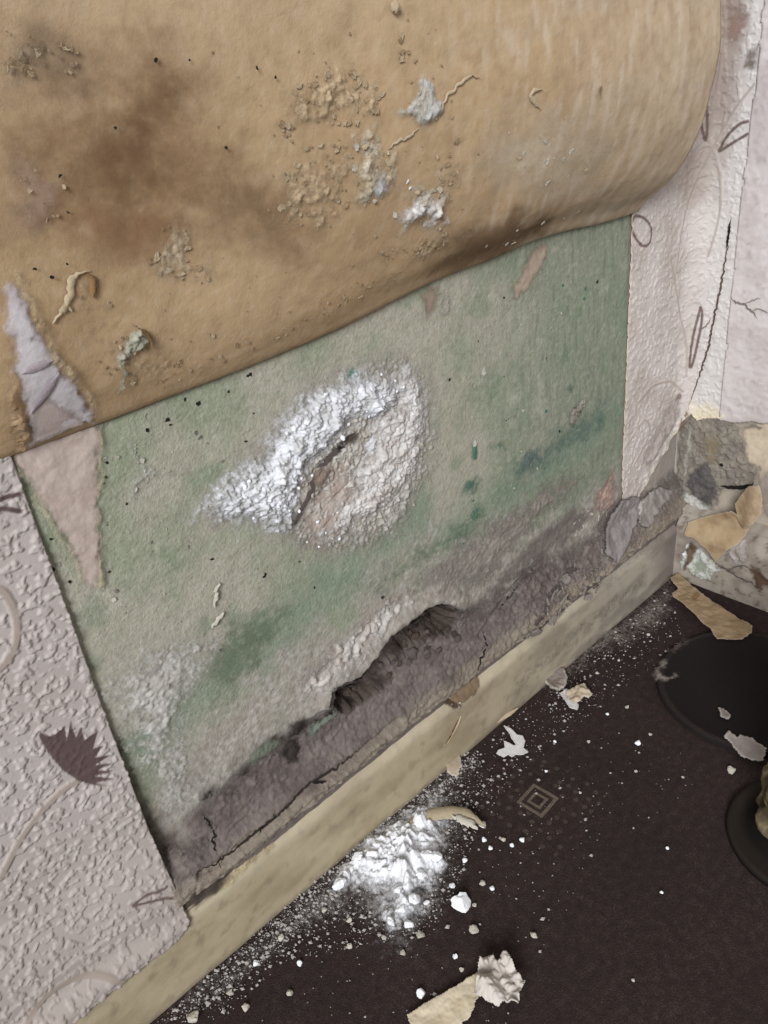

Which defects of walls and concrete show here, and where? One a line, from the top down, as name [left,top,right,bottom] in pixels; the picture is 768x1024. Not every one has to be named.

flaking render [353,74,480,181]
flaking render [113,325,153,394]
peeling [513,245,547,299]
crack [688,216,768,410]
leakage [198,354,438,556]
leakage [418,469,589,621]
leakage [101,623,271,818]
leakage [297,596,414,700]
flaking render [164,416,768,909]
crack [198,750,359,872]
leakage [189,875,226,908]